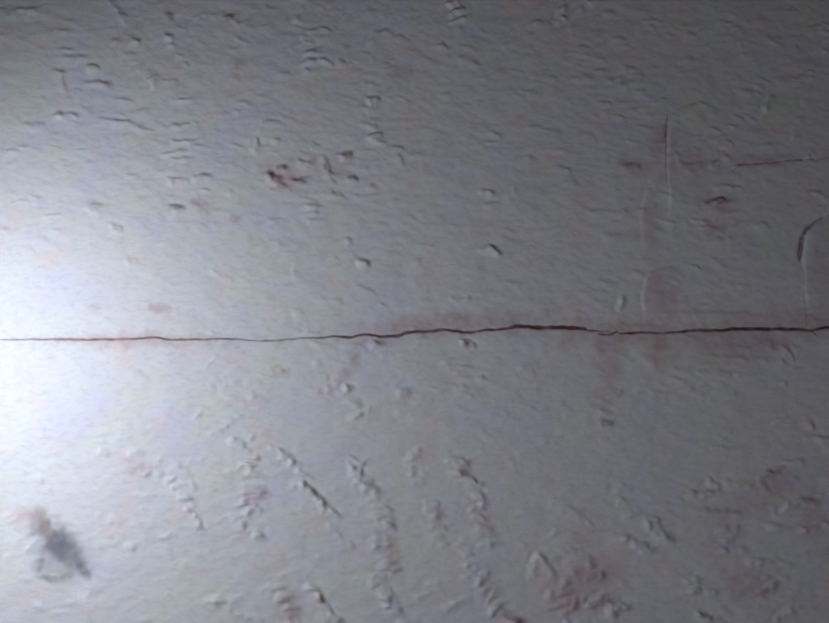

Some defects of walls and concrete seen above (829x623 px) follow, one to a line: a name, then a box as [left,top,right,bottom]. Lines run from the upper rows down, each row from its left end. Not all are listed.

crack [60,335,234,343]
crack [321,324,829,339]